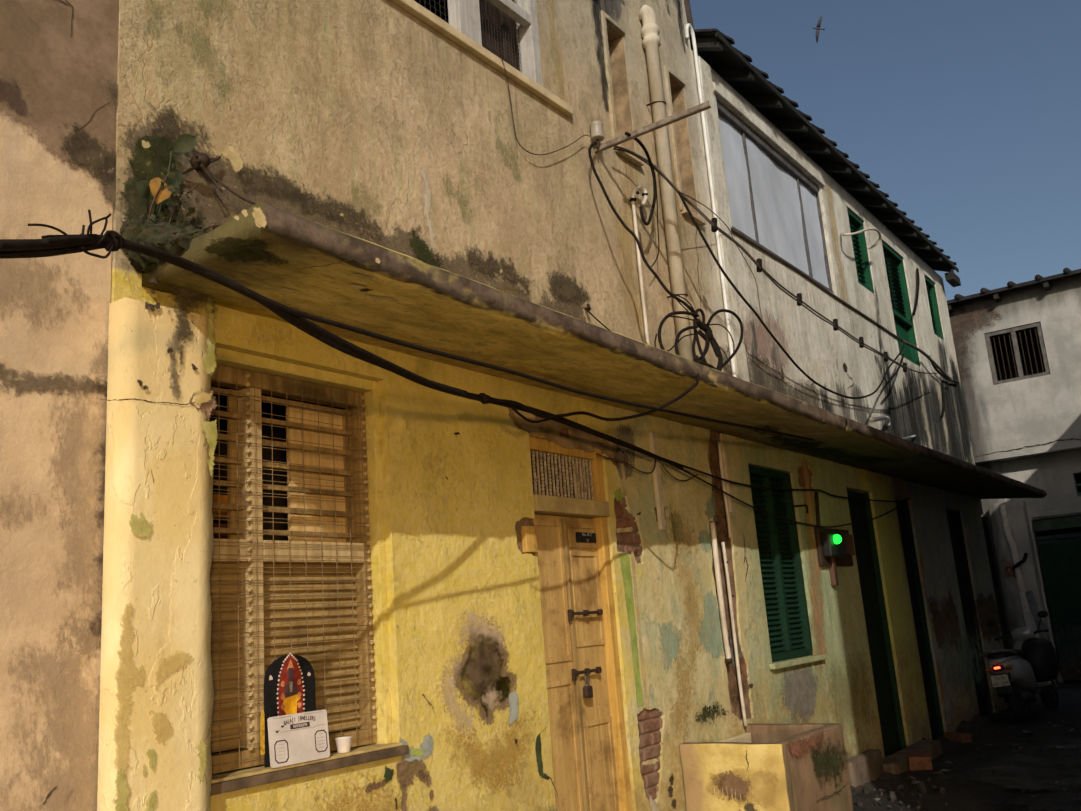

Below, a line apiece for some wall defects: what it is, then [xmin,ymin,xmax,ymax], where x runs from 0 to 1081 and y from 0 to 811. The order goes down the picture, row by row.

crack [59,0,73,37]
leakage [592,0,621,111]
leakage [0,0,591,324]
crack [99,397,210,405]
spalling [189,390,217,476]
leakage [743,287,1001,465]
spalling [614,497,642,564]
spalling [698,431,751,720]
peeling [113,603,192,811]
spalling [395,734,439,811]
spalling [637,708,663,803]
leakage [708,771,775,804]